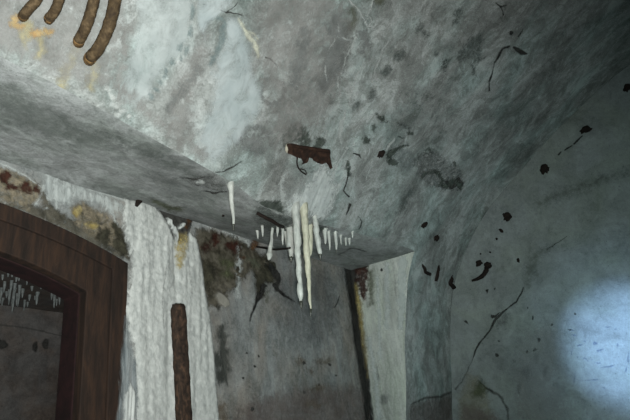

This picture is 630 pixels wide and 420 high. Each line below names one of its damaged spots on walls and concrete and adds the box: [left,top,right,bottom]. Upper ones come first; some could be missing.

crack [488,30,527,91]
leakage [5,174,229,420]
leakage [235,254,293,321]
leakage [247,256,407,420]
crack [473,287,524,358]